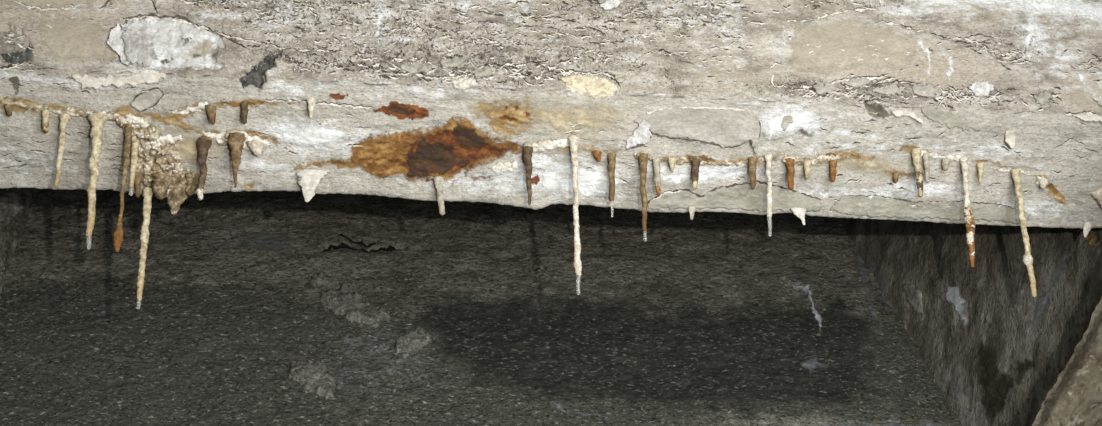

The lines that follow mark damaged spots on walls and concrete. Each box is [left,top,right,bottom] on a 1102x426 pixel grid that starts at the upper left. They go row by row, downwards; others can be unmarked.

crack [13,0,110,11]
crack [151,0,343,56]
spalling [239,54,279,88]
water stain [0,96,228,188]
corrosion [114,102,220,134]
corrosion [233,129,277,143]
corrosion [216,99,300,108]
water stain [242,124,348,153]
corrosion [291,100,534,186]
water stain [519,98,618,153]
water stain [542,162,618,196]
water stain [633,152,903,184]